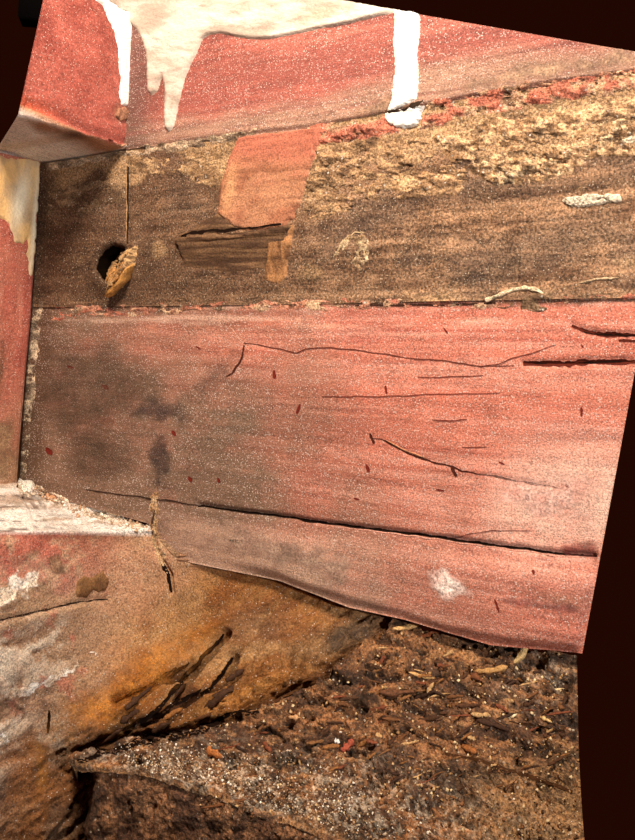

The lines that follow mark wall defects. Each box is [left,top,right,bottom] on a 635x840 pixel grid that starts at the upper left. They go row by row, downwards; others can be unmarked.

crack [226,325,554,398]
crack [369,433,562,489]
crack [86,489,598,592]
peeling [0,570,39,606]
crack [0,598,108,621]